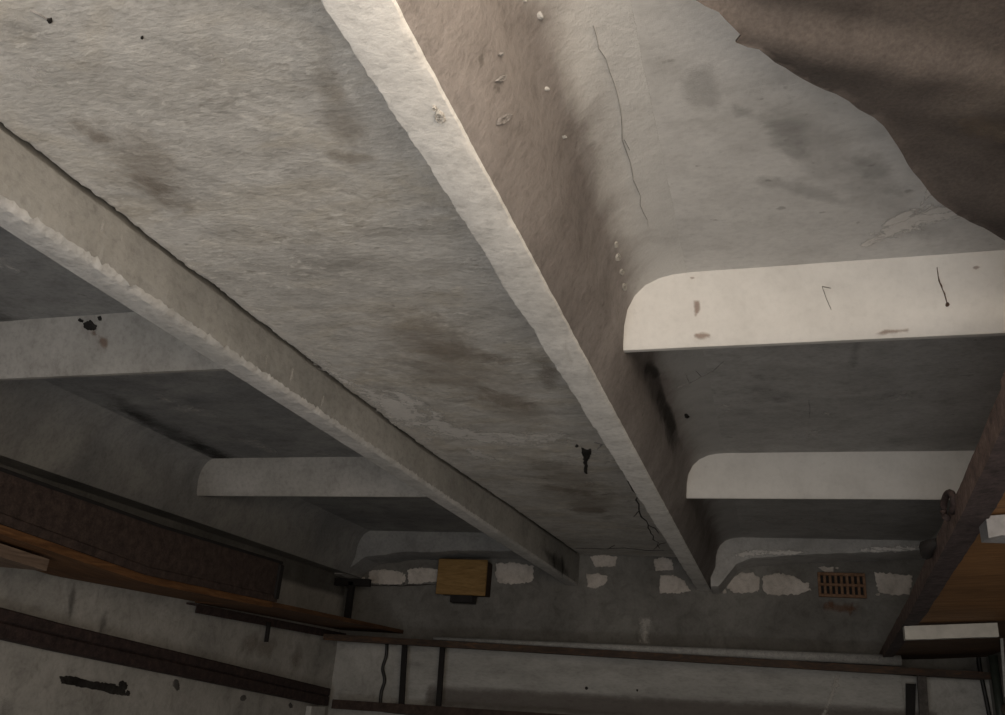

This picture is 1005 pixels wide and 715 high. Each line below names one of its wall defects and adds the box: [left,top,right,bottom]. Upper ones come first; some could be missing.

crack [593,26,648,223]
crack [576,481,663,551]
peeling [361,567,438,585]
peeling [495,562,534,585]
peeling [586,555,617,589]
peeling [654,557,691,594]
peeling [723,572,811,596]
peeling [874,572,913,596]